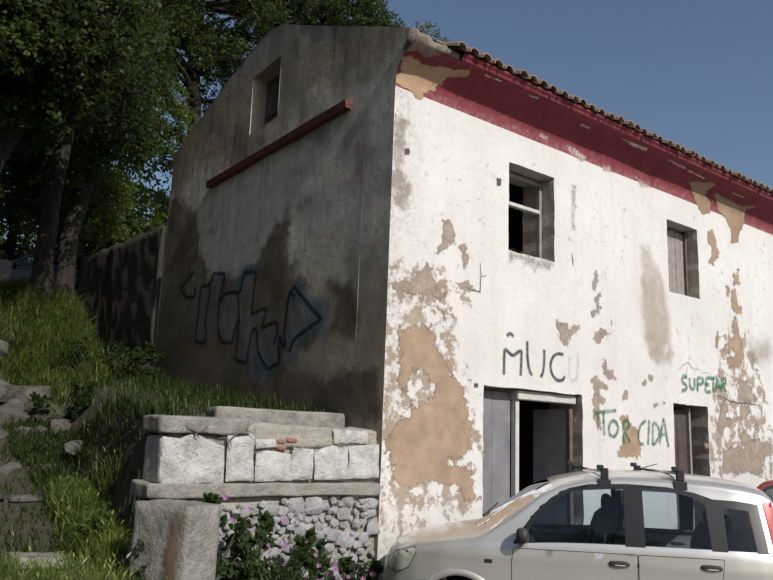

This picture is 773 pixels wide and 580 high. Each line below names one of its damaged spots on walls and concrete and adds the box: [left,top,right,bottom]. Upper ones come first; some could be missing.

spalling [396,56,470,100]
spalling [668,159,760,244]
spalling [436,219,469,269]
spalling [707,229,719,265]
damp [154,198,381,422]
spalling [556,320,580,346]
spalling [591,270,602,318]
spalling [594,328,609,344]
damp [642,276,671,362]
spalling [380,260,485,539]
spalling [590,359,616,429]
spalling [705,268,773,481]